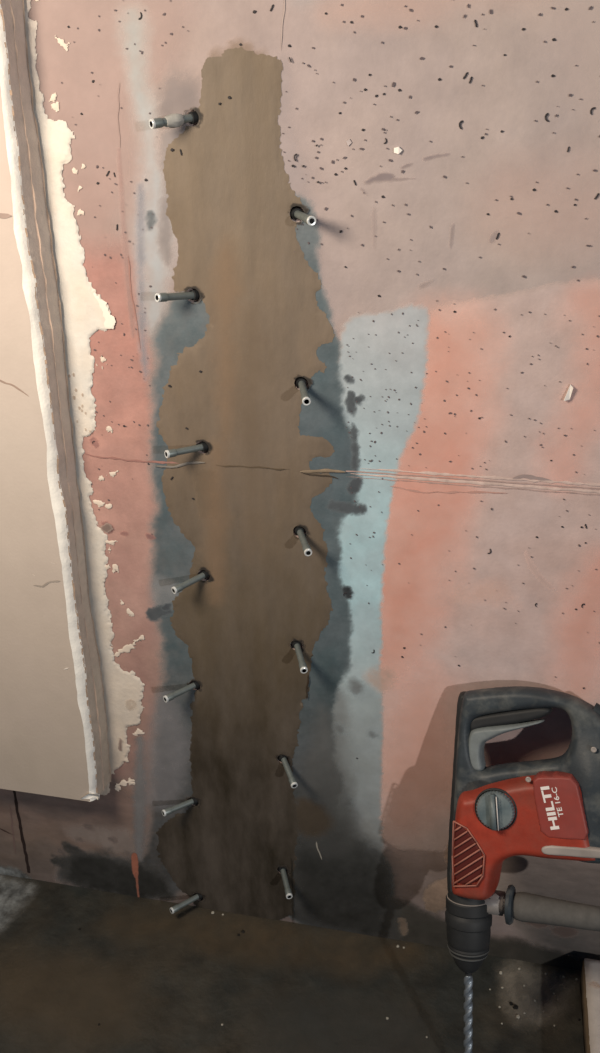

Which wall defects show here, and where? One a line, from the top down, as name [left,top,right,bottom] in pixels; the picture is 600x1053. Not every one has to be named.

water stain [279,70,288,121]
peeling [93,293,116,329]
crack [84,453,600,495]
spalling [93,500,127,573]
peeling [114,635,145,657]
peeling [115,778,135,792]
corrosion [131,853,139,897]